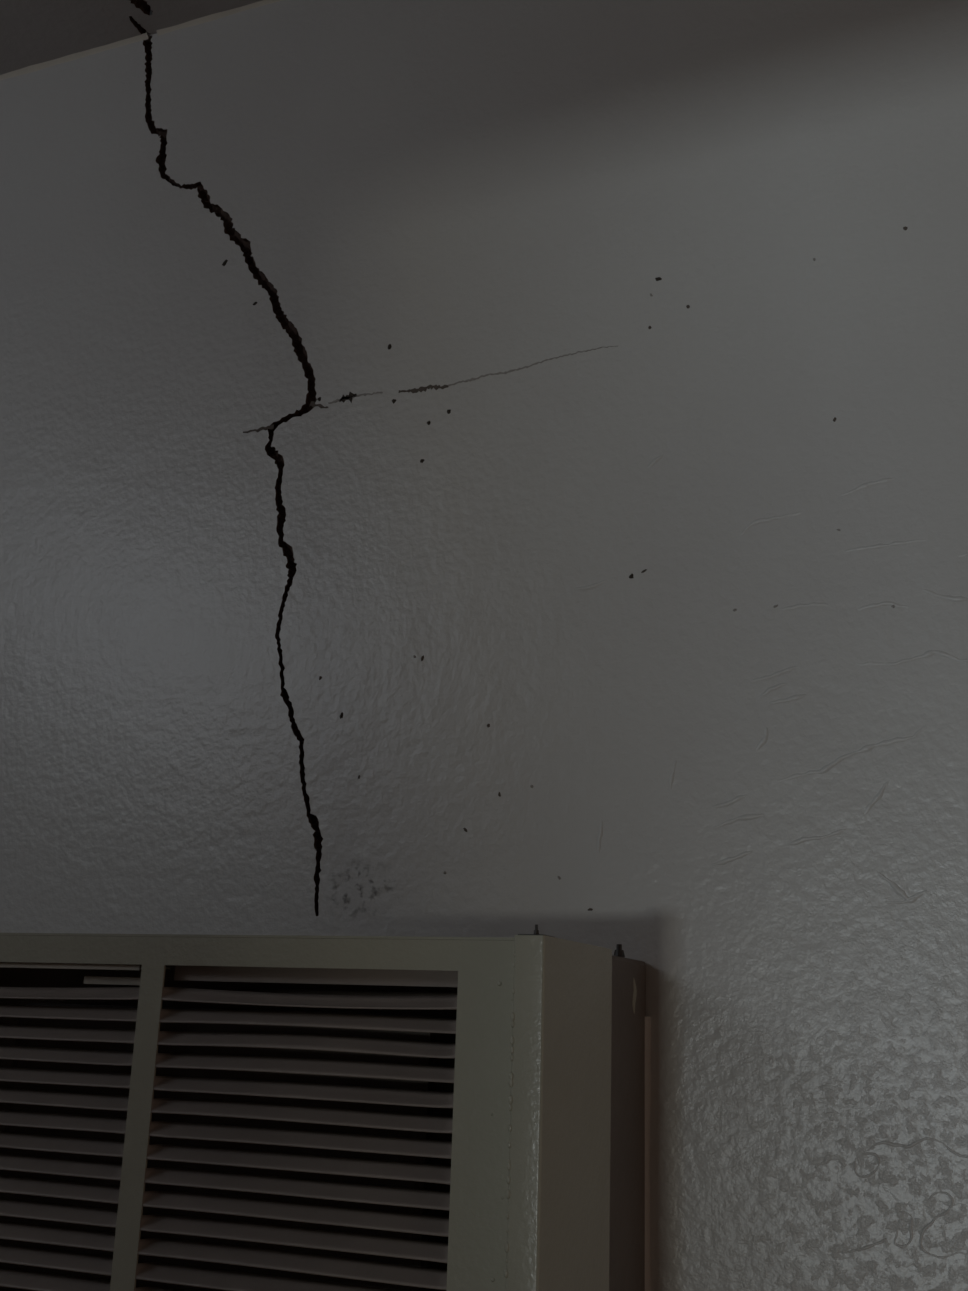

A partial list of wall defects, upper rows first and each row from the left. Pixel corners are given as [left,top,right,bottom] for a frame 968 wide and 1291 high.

crack [129,0,616,916]